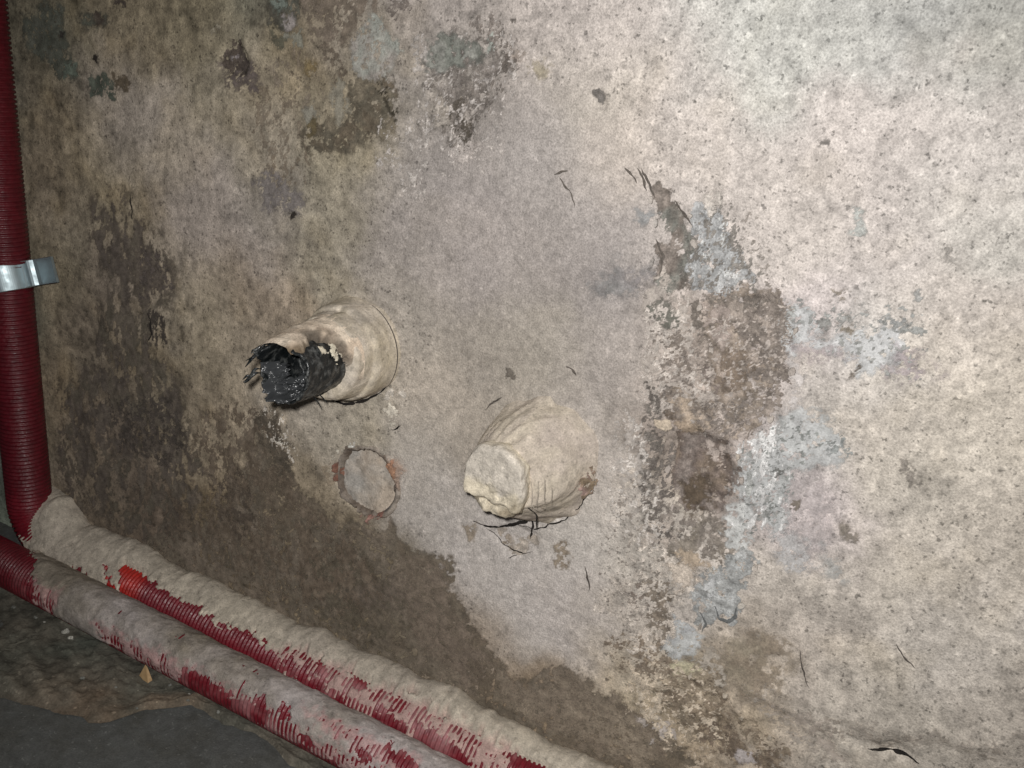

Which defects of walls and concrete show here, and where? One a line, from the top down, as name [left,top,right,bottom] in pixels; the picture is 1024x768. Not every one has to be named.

water stain [22,0,131,101]
water stain [267,0,300,49]
water stain [299,43,398,156]
water stain [720,289,928,557]
water stain [57,194,696,768]
water stain [593,285,724,690]
crack [869,747,919,764]